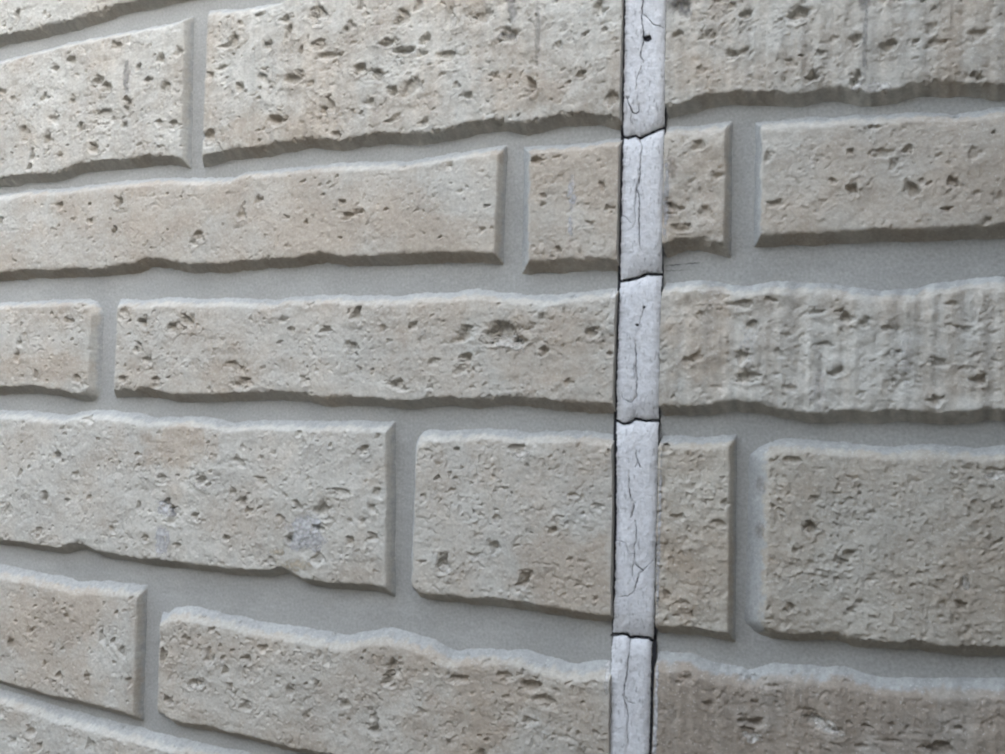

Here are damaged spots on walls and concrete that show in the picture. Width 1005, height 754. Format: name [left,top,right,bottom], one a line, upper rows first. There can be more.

crack [610,0,667,754]